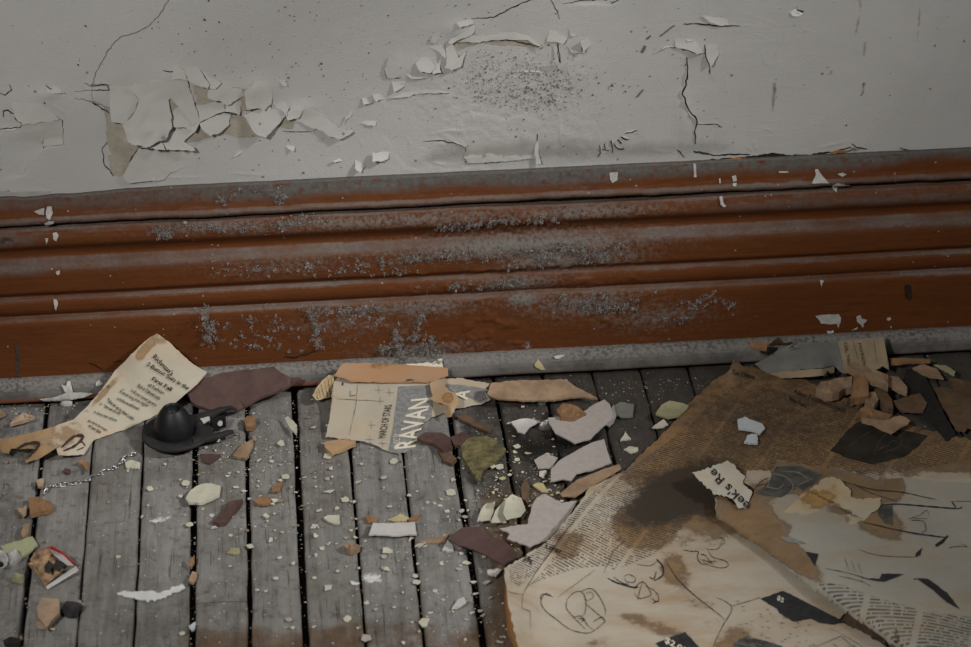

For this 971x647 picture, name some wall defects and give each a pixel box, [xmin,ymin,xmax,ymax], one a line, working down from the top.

crack [472,0,607,19]
peeling [684,16,737,27]
crack [74,0,169,108]
peeling [659,38,719,67]
crack [0,84,22,132]
peeling [92,19,591,183]
crack [677,45,721,157]